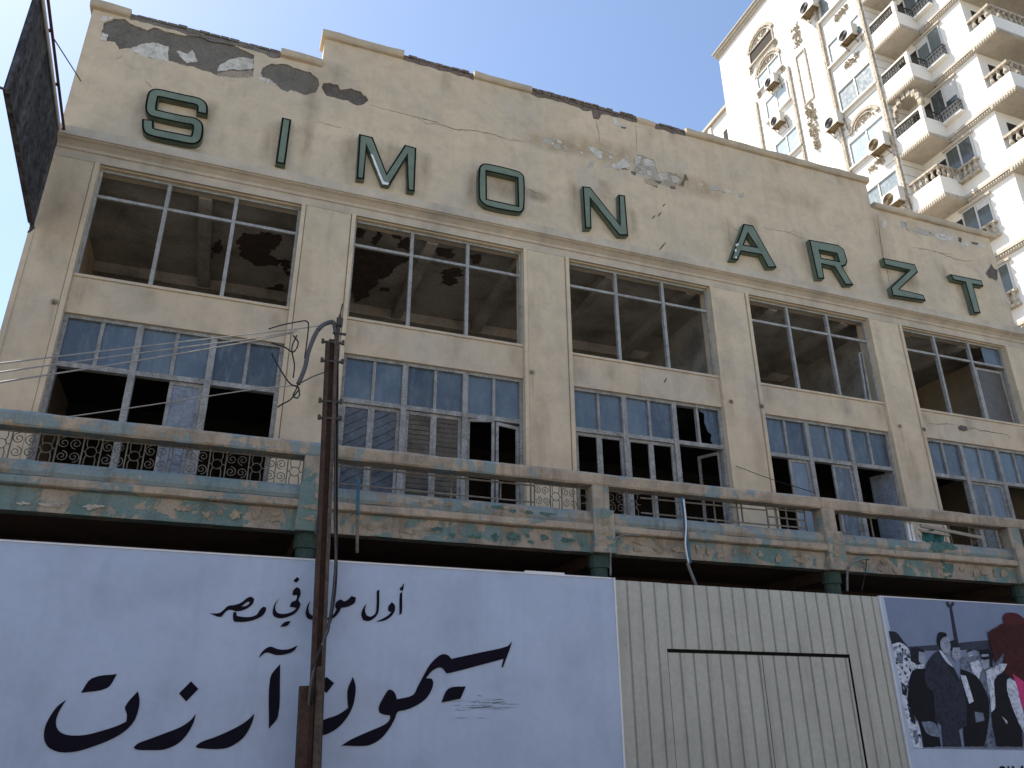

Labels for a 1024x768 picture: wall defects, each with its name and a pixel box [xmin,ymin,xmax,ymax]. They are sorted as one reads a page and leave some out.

spalling [100,16,368,105]
spalling [528,135,688,189]
peeling [430,527,584,547]
peeling [861,541,1008,579]